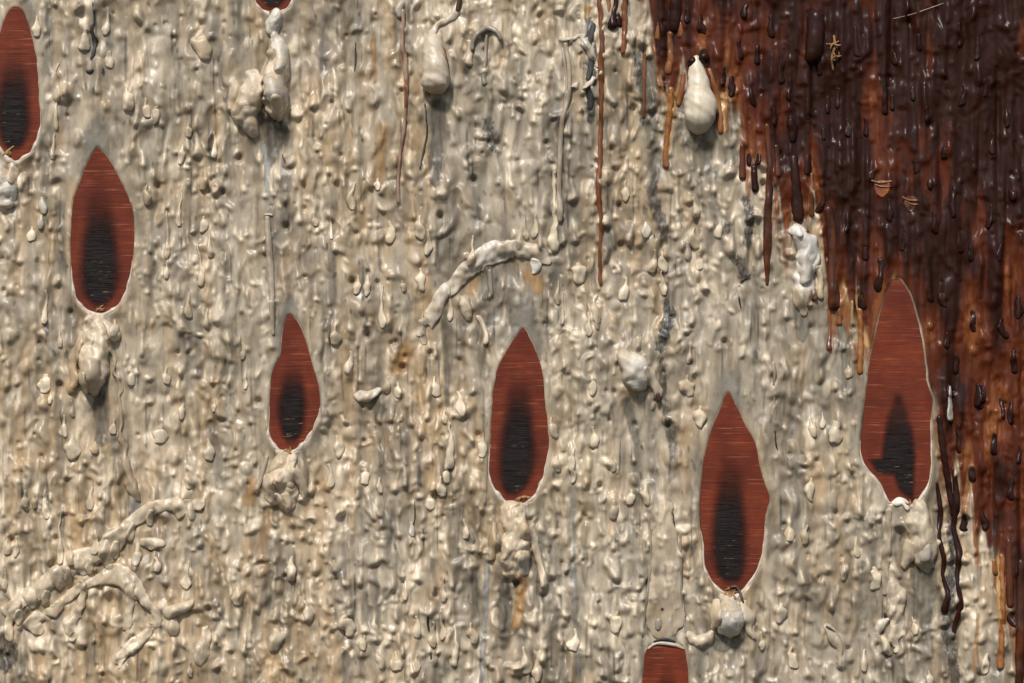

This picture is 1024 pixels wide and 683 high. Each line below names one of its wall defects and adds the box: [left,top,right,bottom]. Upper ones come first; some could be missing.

peeling [0,6,41,163]
peeling [70,116,134,316]
rust [585,0,628,286]
rust [655,22,683,169]
rust [717,85,728,132]
peeling [267,297,320,454]
peeling [488,299,549,504]
rust [826,279,873,375]
peeling [860,279,933,508]
peeling [699,369,770,603]
peeling [642,638,688,683]
rust [992,553,1006,670]